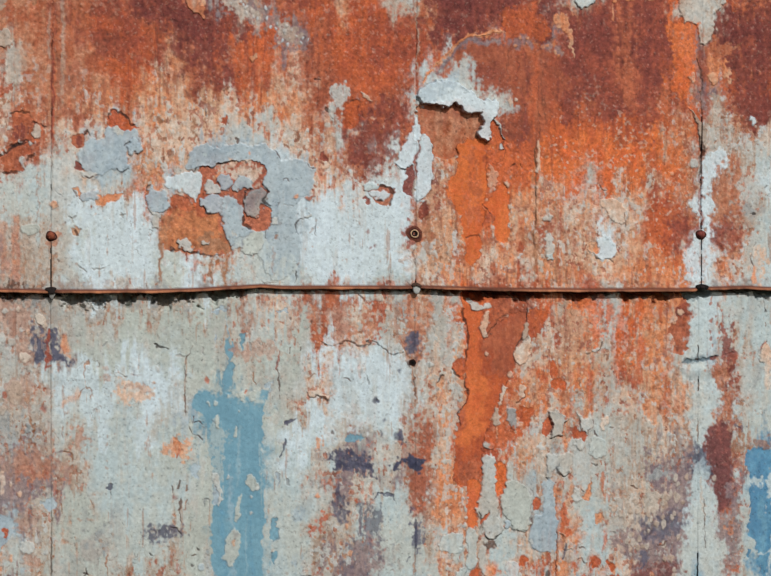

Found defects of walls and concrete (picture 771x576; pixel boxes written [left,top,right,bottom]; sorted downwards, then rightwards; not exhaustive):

rust [130,0,310,93]
rust [422,0,701,163]
peeling [678,0,742,86]
rust [714,0,771,132]
peeling [70,108,144,206]
peeling [145,141,377,347]
rust [347,93,413,205]
peeling [394,52,535,267]
peeling [542,213,556,260]
rust [661,164,759,262]
peeling [437,290,694,576]
rust [701,296,743,576]